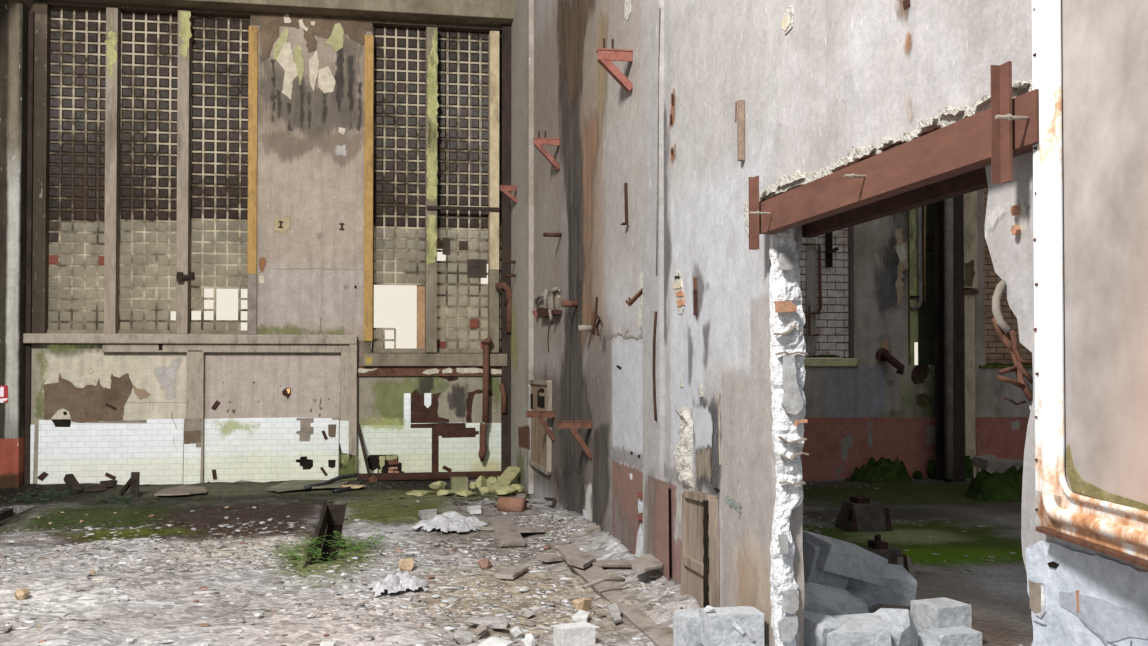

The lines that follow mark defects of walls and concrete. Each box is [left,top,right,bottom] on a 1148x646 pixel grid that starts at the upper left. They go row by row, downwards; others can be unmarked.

flaking render [259,12,366,100]
leakage [557,0,607,107]
spalling [1012,80,1032,99]
peeling [335,127,347,156]
spalling [744,95,991,235]
flaking render [44,367,151,427]
peeling [184,418,202,447]
leakage [555,64,684,570]
spalling [674,407,694,490]
spalling [769,228,809,646]
rust [992,318,1033,402]
spalling [1025,541,1148,646]